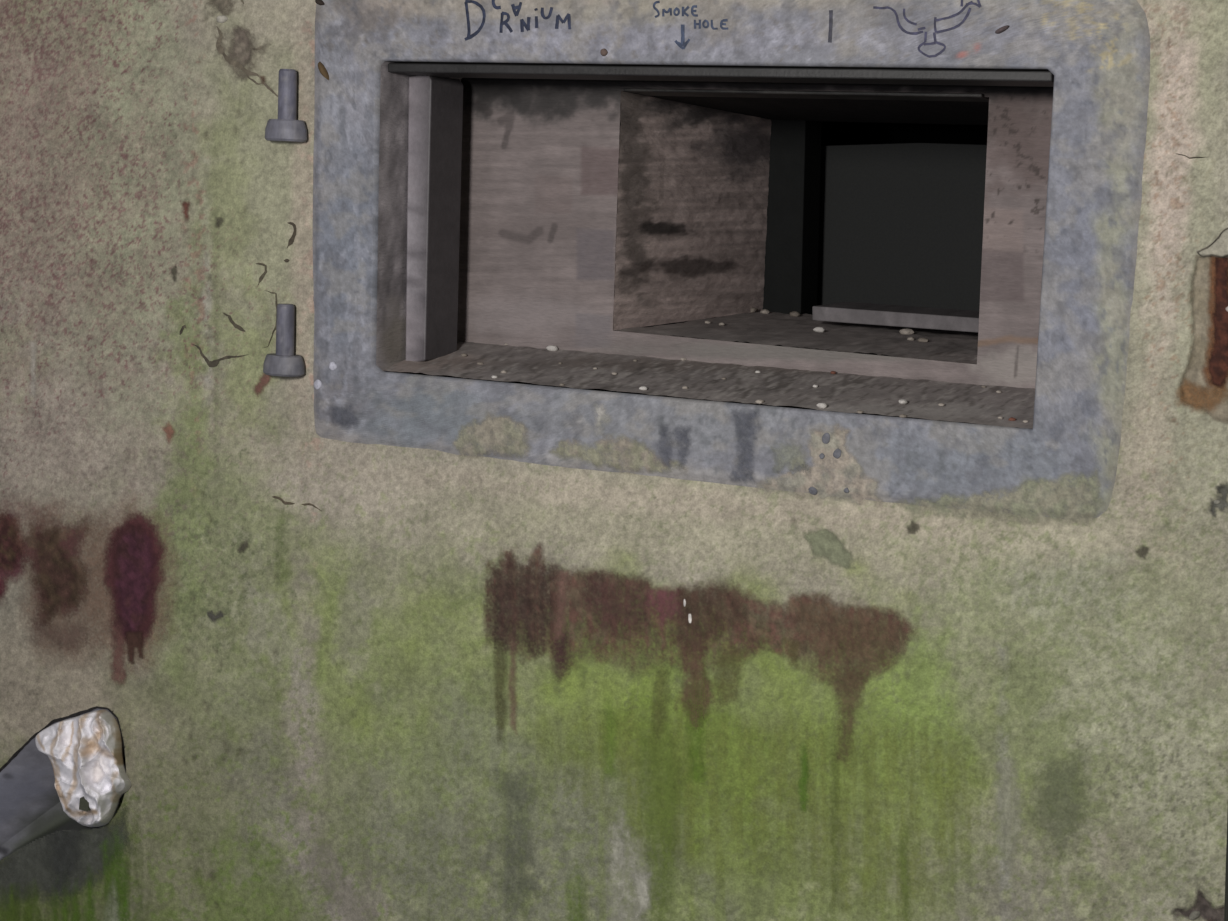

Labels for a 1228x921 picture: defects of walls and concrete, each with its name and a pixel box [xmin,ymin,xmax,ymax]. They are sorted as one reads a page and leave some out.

crack [216,26,278,97]
rust [1178,256,1228,409]
spalling [1210,485,1228,516]
rust [0,512,163,683]
rust [485,546,910,758]
water stain [0,820,127,907]
water stain [612,826,649,920]
spalling [1174,891,1224,921]